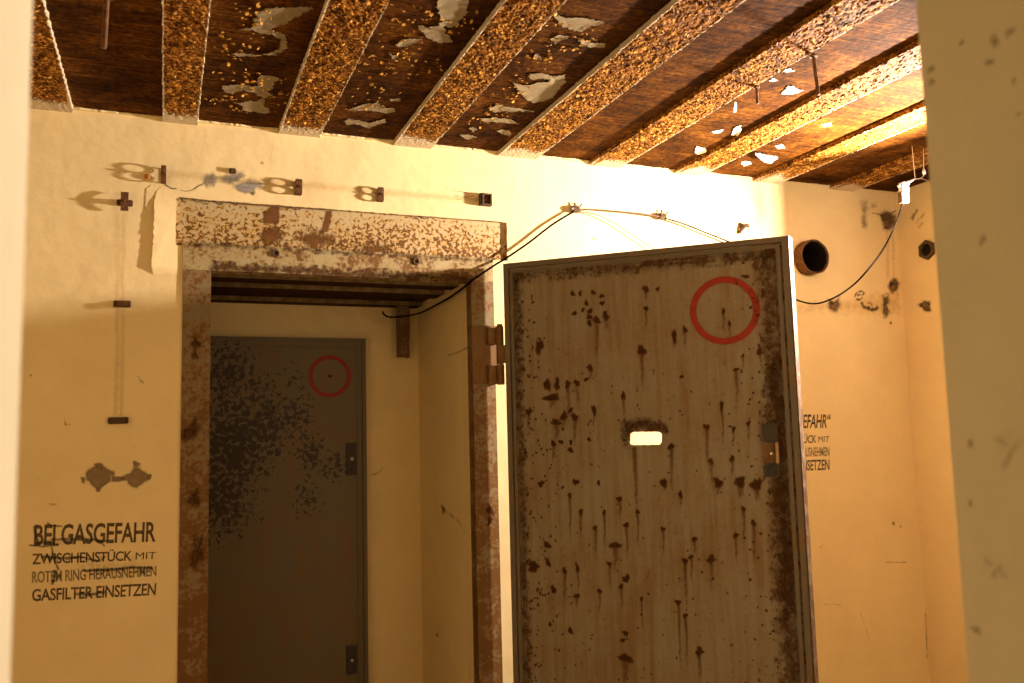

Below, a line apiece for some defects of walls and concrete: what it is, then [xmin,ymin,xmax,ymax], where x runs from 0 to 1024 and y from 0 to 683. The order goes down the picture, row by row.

peeling [231,6,313,57]
peeling [389,0,469,59]
peeling [550,15,605,48]
peeling [222,75,279,114]
peeling [344,98,400,129]
peeling [460,73,567,140]
peeling [769,68,803,95]
peeling [741,144,785,166]
corrosion [193,207,491,284]
corrosion [181,416,200,440]
corrosion [513,272,683,683]
corrosion [546,247,806,683]